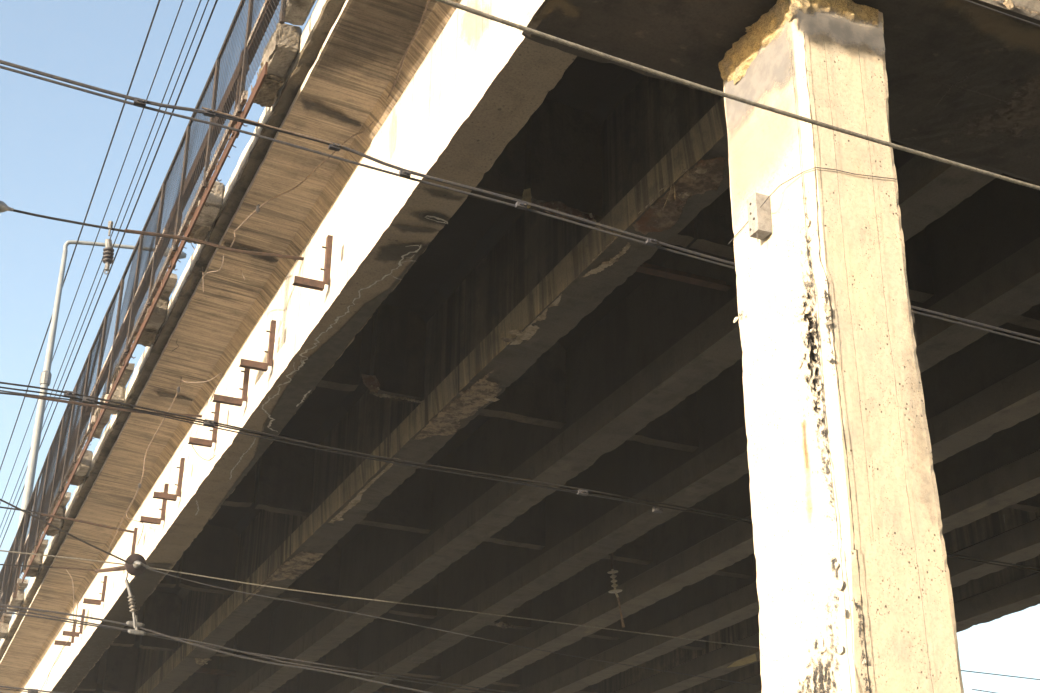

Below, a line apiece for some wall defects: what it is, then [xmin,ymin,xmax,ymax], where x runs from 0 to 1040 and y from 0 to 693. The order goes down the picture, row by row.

spalling [538,201,596,223]
spalling [580,242,631,278]
crack [229,245,421,479]
crack [791,34,871,693]
spalling [415,370,502,440]
spalling [244,551,324,602]